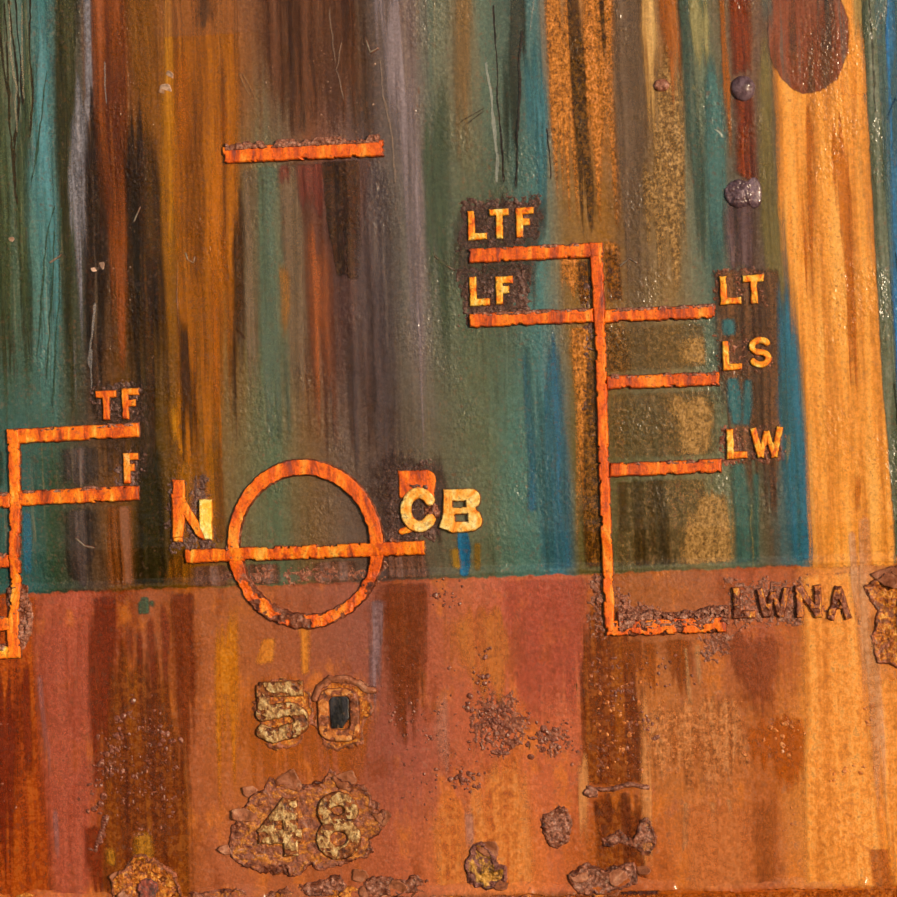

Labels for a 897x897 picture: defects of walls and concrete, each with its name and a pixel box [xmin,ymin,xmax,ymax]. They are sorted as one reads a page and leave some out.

rust [161,0,380,586]
rust [248,0,897,897]
peeling [870,565,897,589]
rust [0,582,53,897]
peeling [0,888,117,897]
rust [78,647,247,897]
rust [215,619,238,774]
rust [217,768,429,897]
peeling [182,876,869,897]